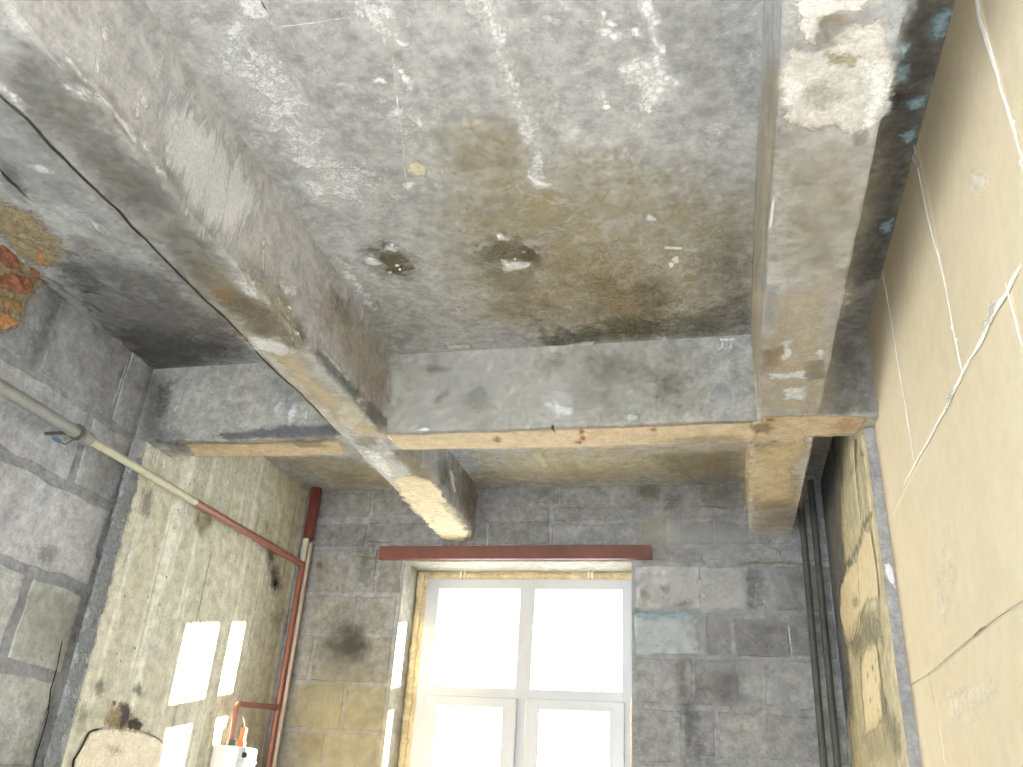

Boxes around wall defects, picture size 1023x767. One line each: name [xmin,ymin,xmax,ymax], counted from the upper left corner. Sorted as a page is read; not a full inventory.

water stain [21,162,56,175]
water stain [135,50,262,249]
flaking render [0,201,72,332]
water stain [69,262,237,369]
crack [0,94,324,418]
spalling [360,242,414,277]
spalling [474,233,545,272]
water stain [665,246,682,268]